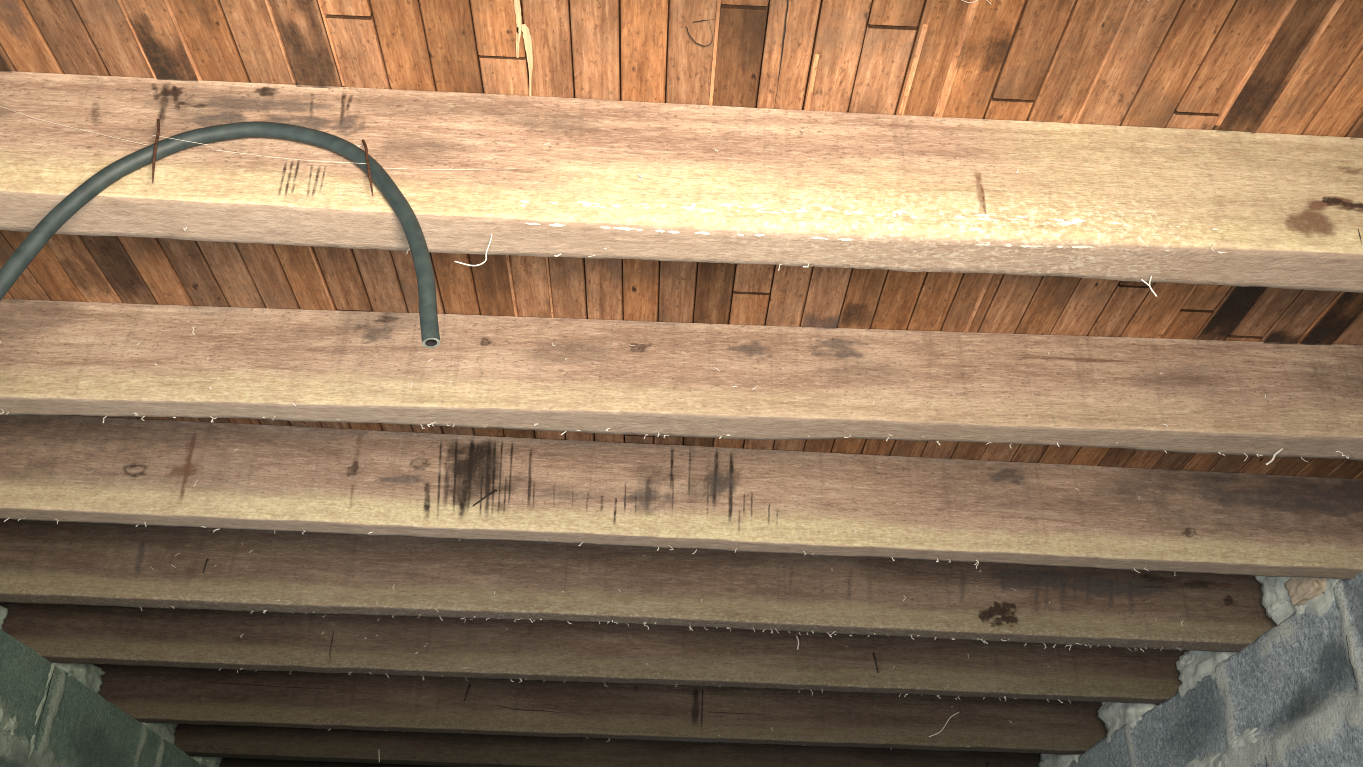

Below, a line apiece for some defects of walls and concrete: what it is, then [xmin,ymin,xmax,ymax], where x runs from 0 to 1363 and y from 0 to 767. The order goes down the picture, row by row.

leakage [382,442,513,515]
leakage [707,453,752,517]
leakage [979,572,1161,626]